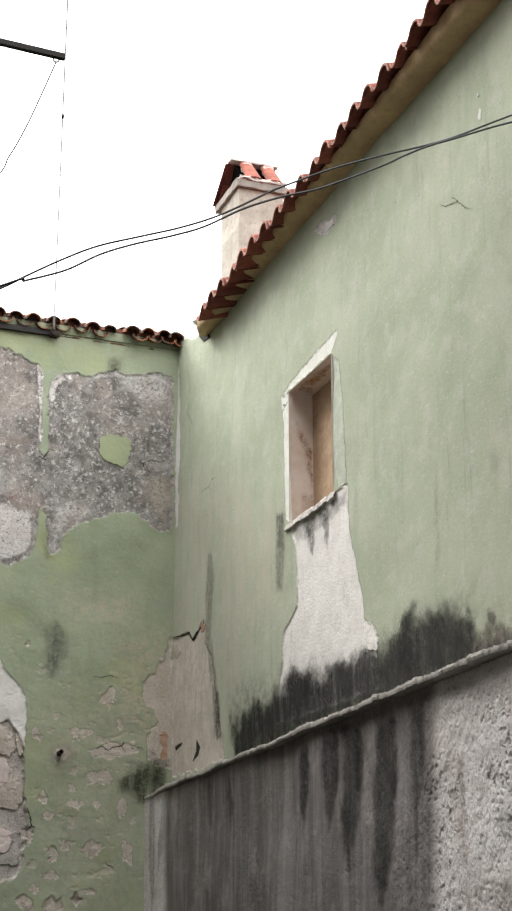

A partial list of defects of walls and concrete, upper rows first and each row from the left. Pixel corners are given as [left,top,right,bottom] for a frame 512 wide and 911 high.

peeling [0,347,181,567]
spalling [0,660,43,883]
spalling [52,726,93,761]
peeling [86,621,224,785]
water stain [230,604,512,756]
spalling [14,840,105,911]